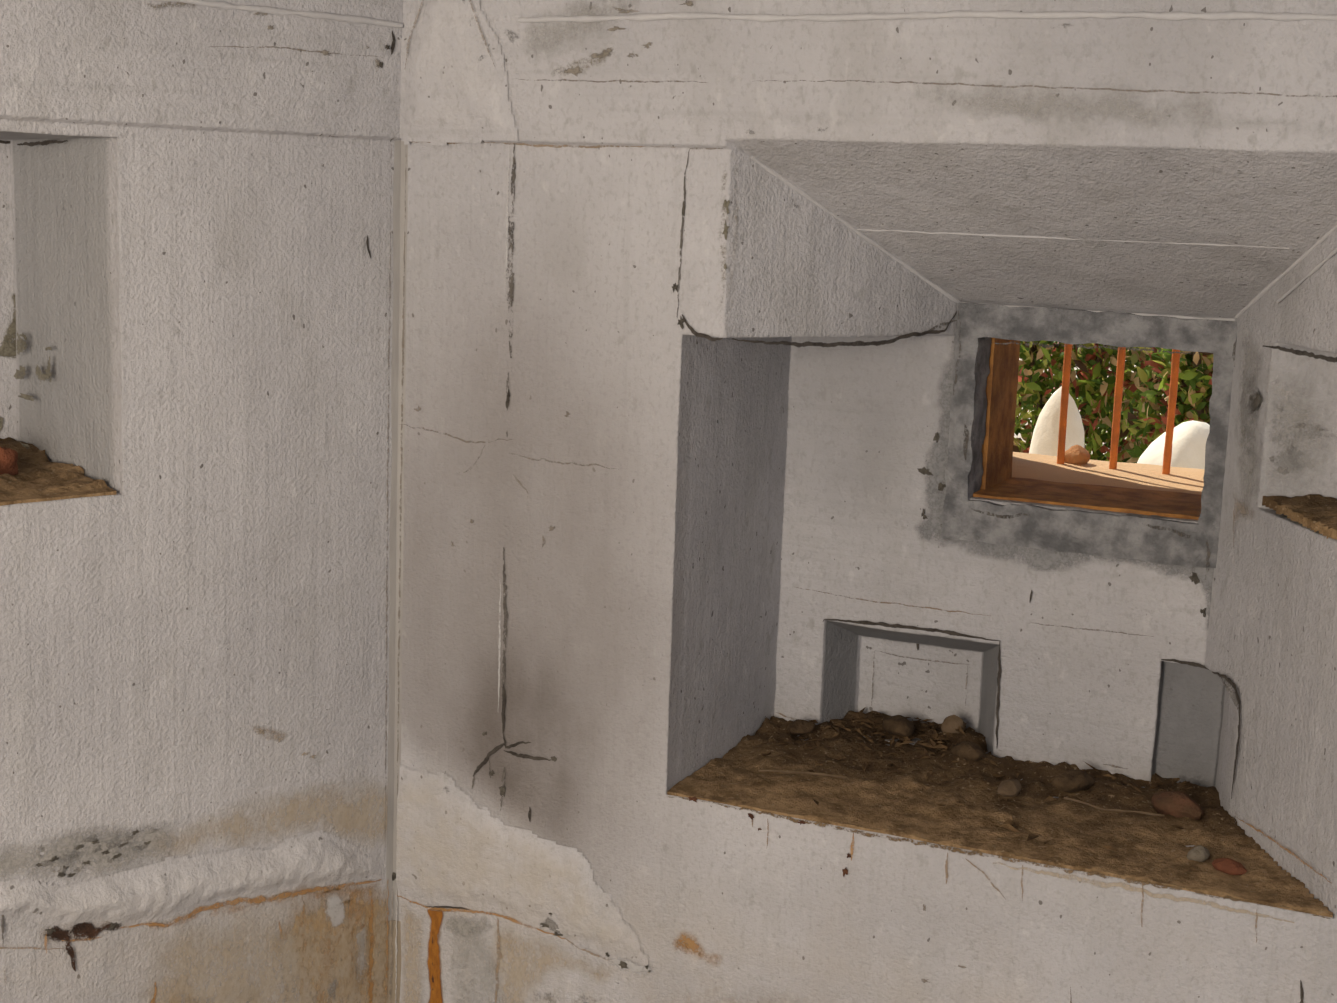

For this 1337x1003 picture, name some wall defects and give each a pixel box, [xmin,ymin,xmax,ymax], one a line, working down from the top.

crack [672,148,1199,391]
crack [366,142,653,829]
crack [962,425,970,460]
crack [0,892,8,983]
leakage [150,881,611,1003]
corrosion [427,908,455,1003]